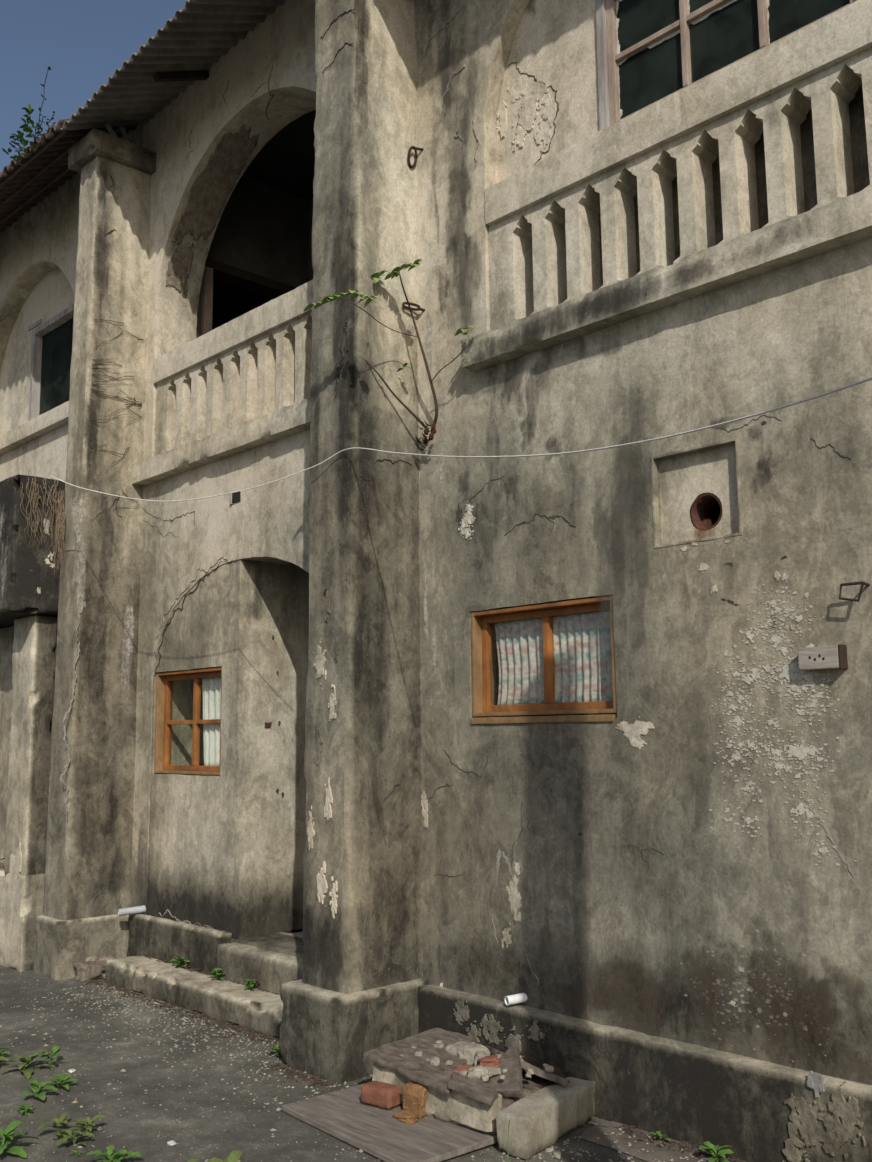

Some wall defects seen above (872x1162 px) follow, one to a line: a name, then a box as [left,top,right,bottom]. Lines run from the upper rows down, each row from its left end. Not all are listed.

water stain [354,0,369,100]
spalling [166,124,259,298]
spalling [456,503,475,540]
crack [504,514,576,536]
crack [154,559,237,676]
spalling [307,633,339,850]
spalling [615,716,654,749]
peeling [709,556,840,871]
spalling [317,861,338,919]
water stain [492,849,522,949]
spalling [453,998,545,1059]
spalling [782,1081,866,1162]